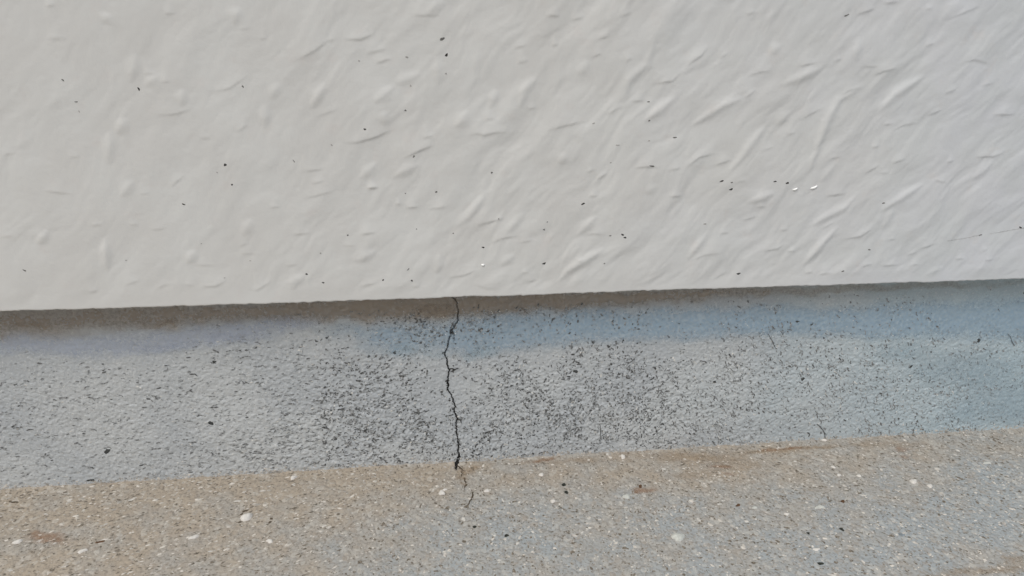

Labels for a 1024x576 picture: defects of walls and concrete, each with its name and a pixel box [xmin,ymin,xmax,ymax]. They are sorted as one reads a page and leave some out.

crack [442,297,474,505]